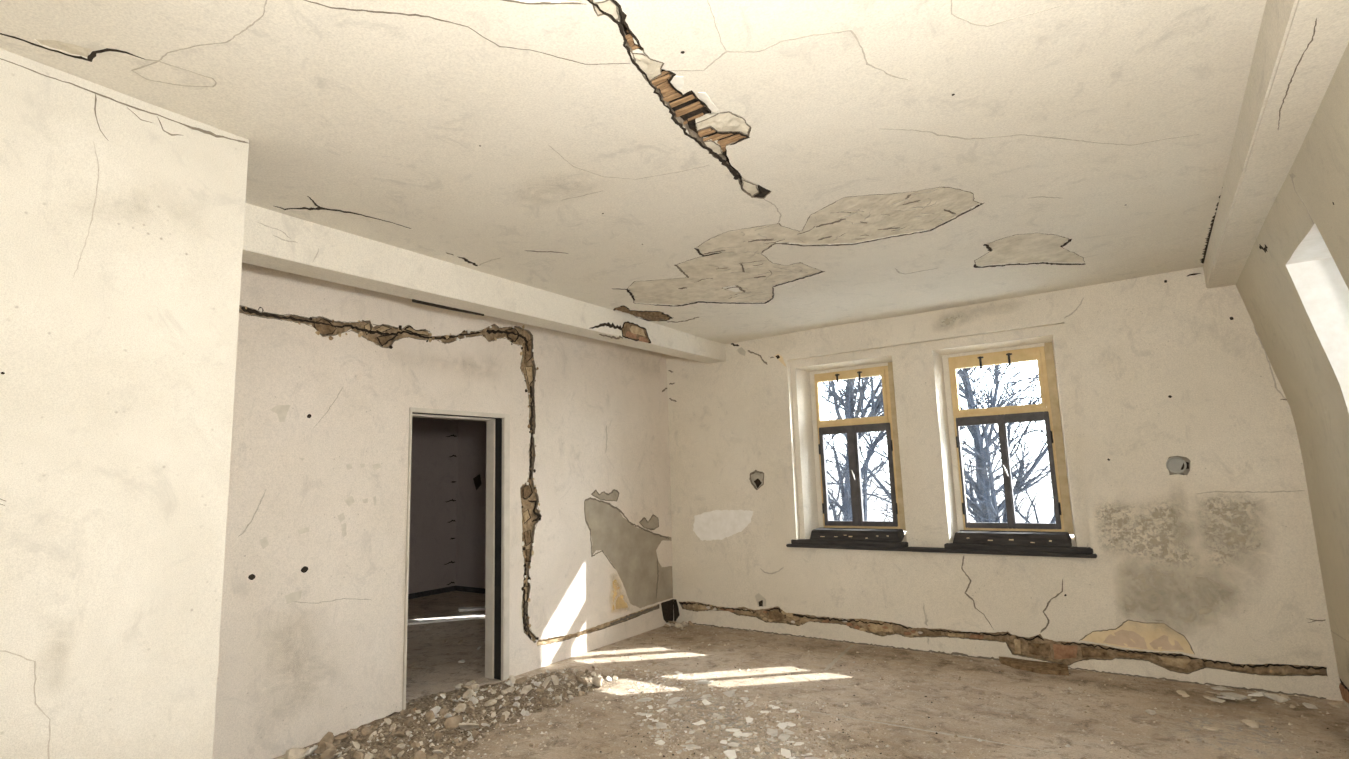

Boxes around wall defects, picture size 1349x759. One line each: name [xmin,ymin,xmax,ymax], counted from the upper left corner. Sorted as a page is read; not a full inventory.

crack [305,0,630,65]
crack [665,0,910,81]
crack [0,0,267,278]
flaking render [503,0,984,343]
flaking render [973,233,1085,268]
crack [238,490,266,537]
flaking render [584,489,673,608]
water stain [1102,508,1187,560]
crack [534,556,1349,704]
peeling [1079,620,1195,654]
crack [0,650,51,759]